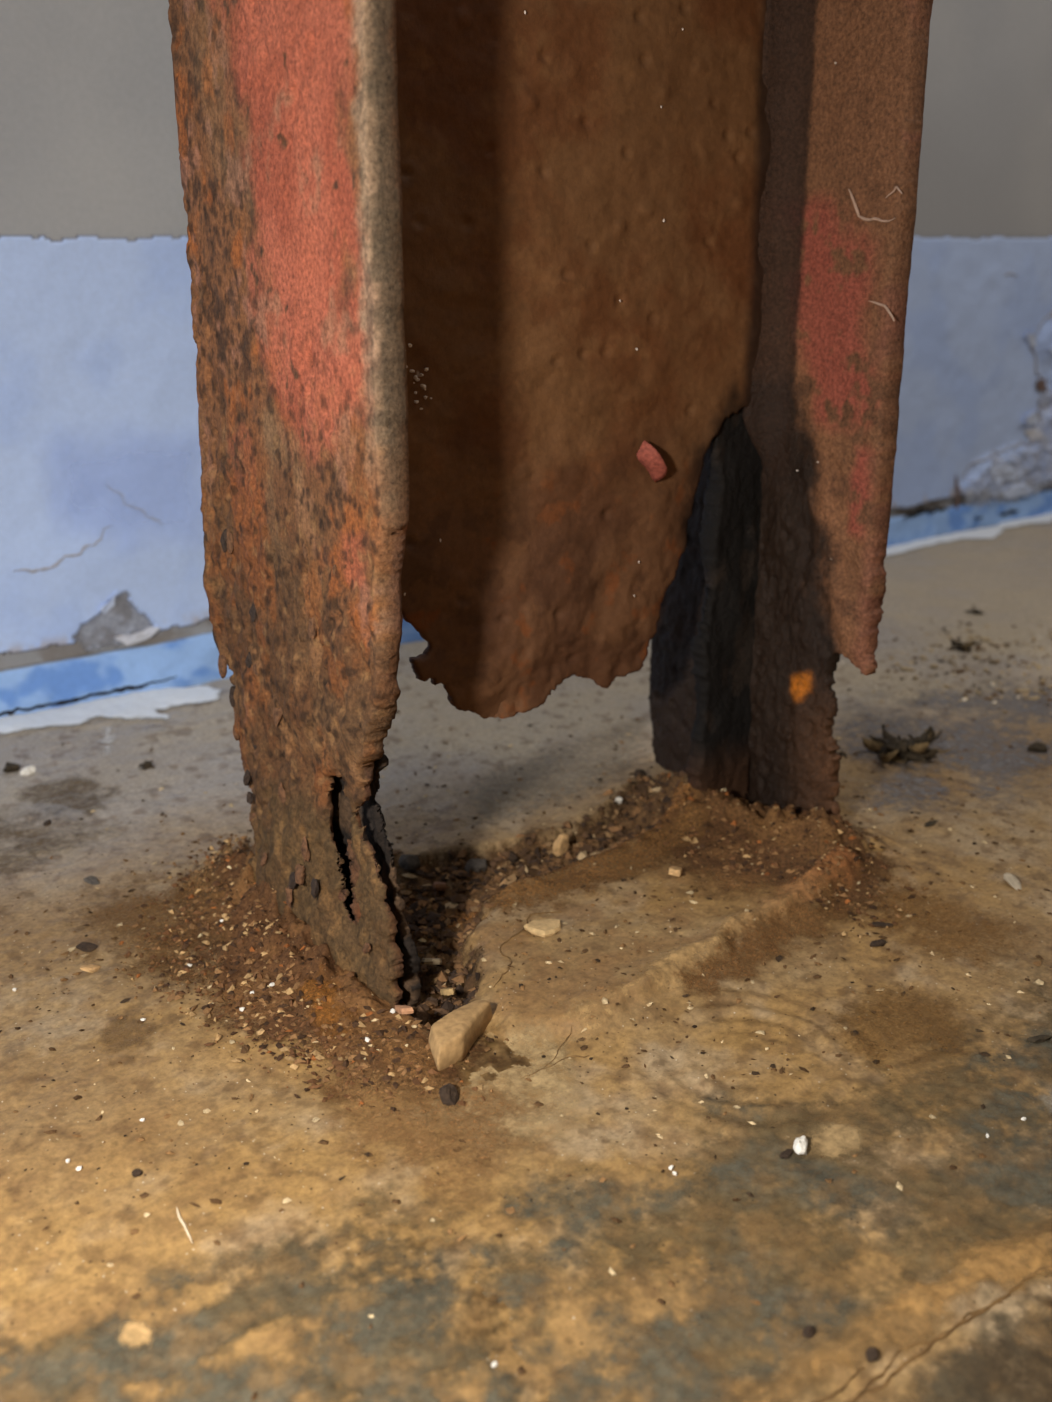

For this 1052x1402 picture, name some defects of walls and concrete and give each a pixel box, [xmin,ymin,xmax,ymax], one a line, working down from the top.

spalling [72,590,160,651]
corrosion [487,785,1018,996]
damp [101,1018,157,1050]
damp [421,1029,577,1137]
damp [470,985,1052,1402]
damp [0,1214,521,1402]
crack [812,1264,1052,1402]